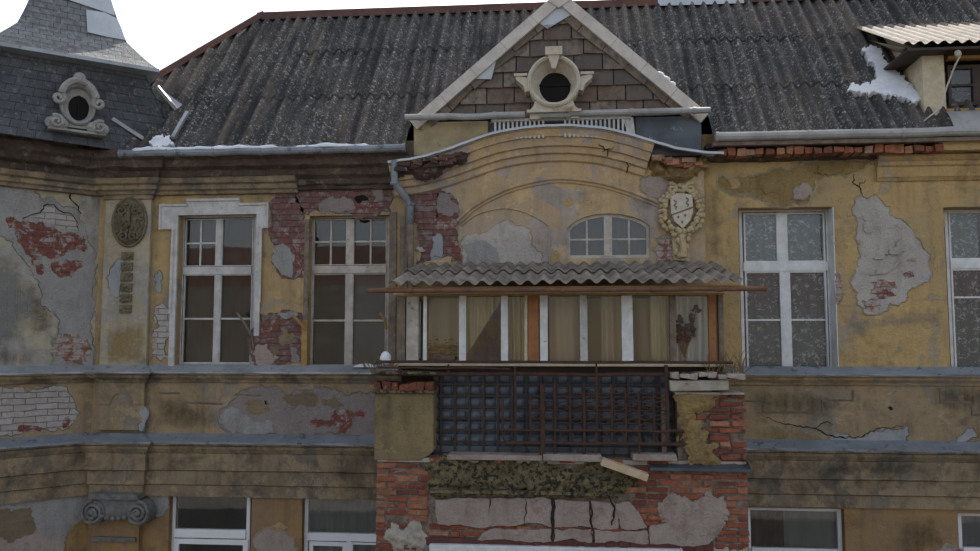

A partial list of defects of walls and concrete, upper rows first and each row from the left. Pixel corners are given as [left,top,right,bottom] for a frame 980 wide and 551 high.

flaking render [639,154,708,199]
flaking render [716,159,876,209]
flaking render [0,186,125,366]
flaking render [268,190,394,280]
spalling [411,189,560,265]
flaking render [835,193,933,316]
flaking render [247,309,304,366]
flaking render [0,384,80,437]
flaking render [218,384,375,435]
crack [767,417,903,439]
flaking render [0,495,89,551]
flaking render [252,522,299,551]